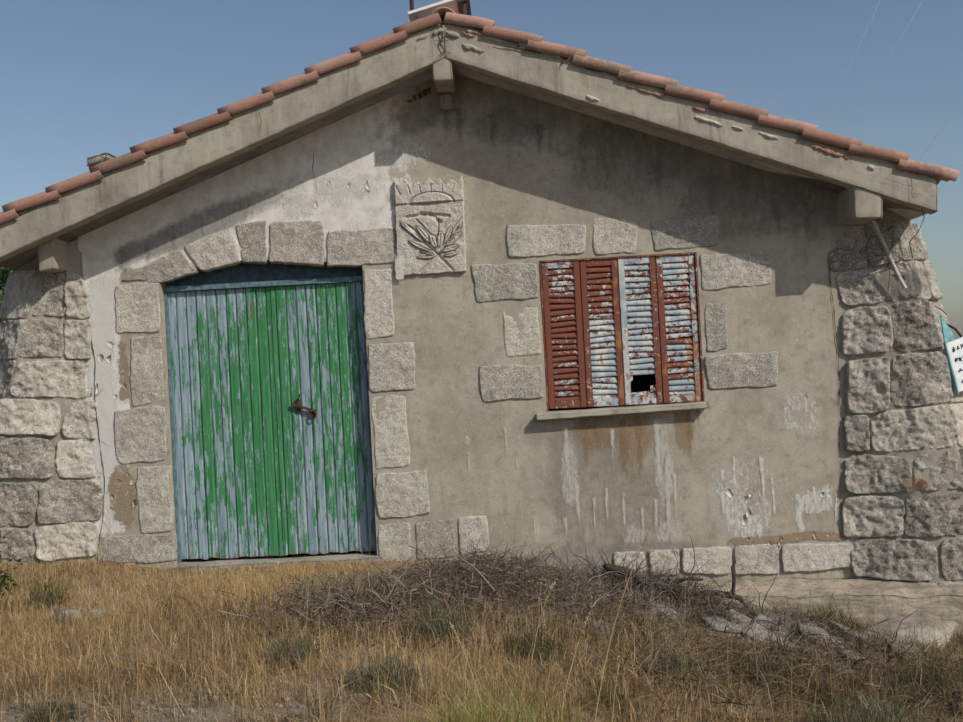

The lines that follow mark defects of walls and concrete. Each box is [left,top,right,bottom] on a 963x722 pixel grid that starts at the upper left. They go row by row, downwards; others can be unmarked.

crack [433,31,454,56]
peeling [87,275,137,529]
water stain [561,427,580,534]
water stain [622,420,682,543]